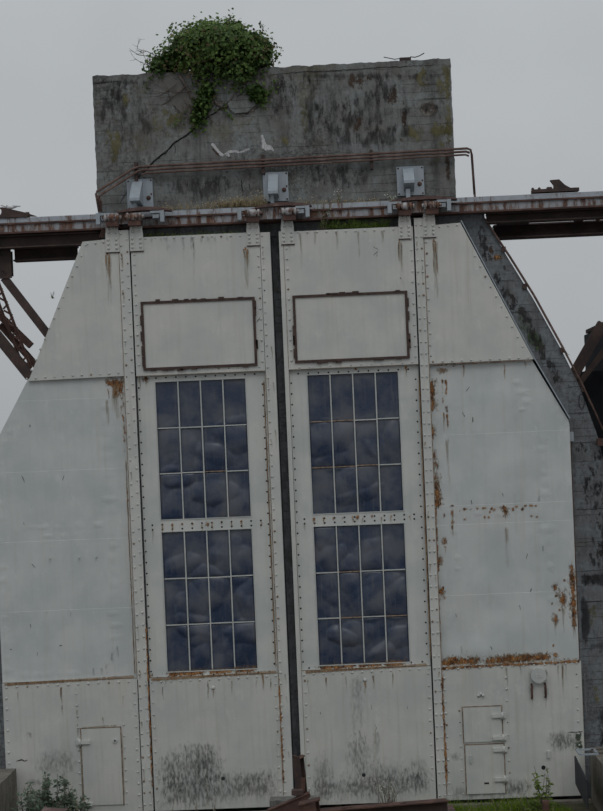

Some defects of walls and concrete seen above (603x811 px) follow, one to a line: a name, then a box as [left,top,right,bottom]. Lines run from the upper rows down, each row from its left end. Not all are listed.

crack [119,92,244,204]
leakage [330,74,408,145]
mould [494,273,560,382]
rust [430,363,477,426]
rust [5,378,284,787]
rust [306,383,435,682]
rust [433,452,538,571]
rust [551,566,577,629]
leakage [576,443,603,585]
leakage [581,597,603,649]
rust [439,644,580,782]